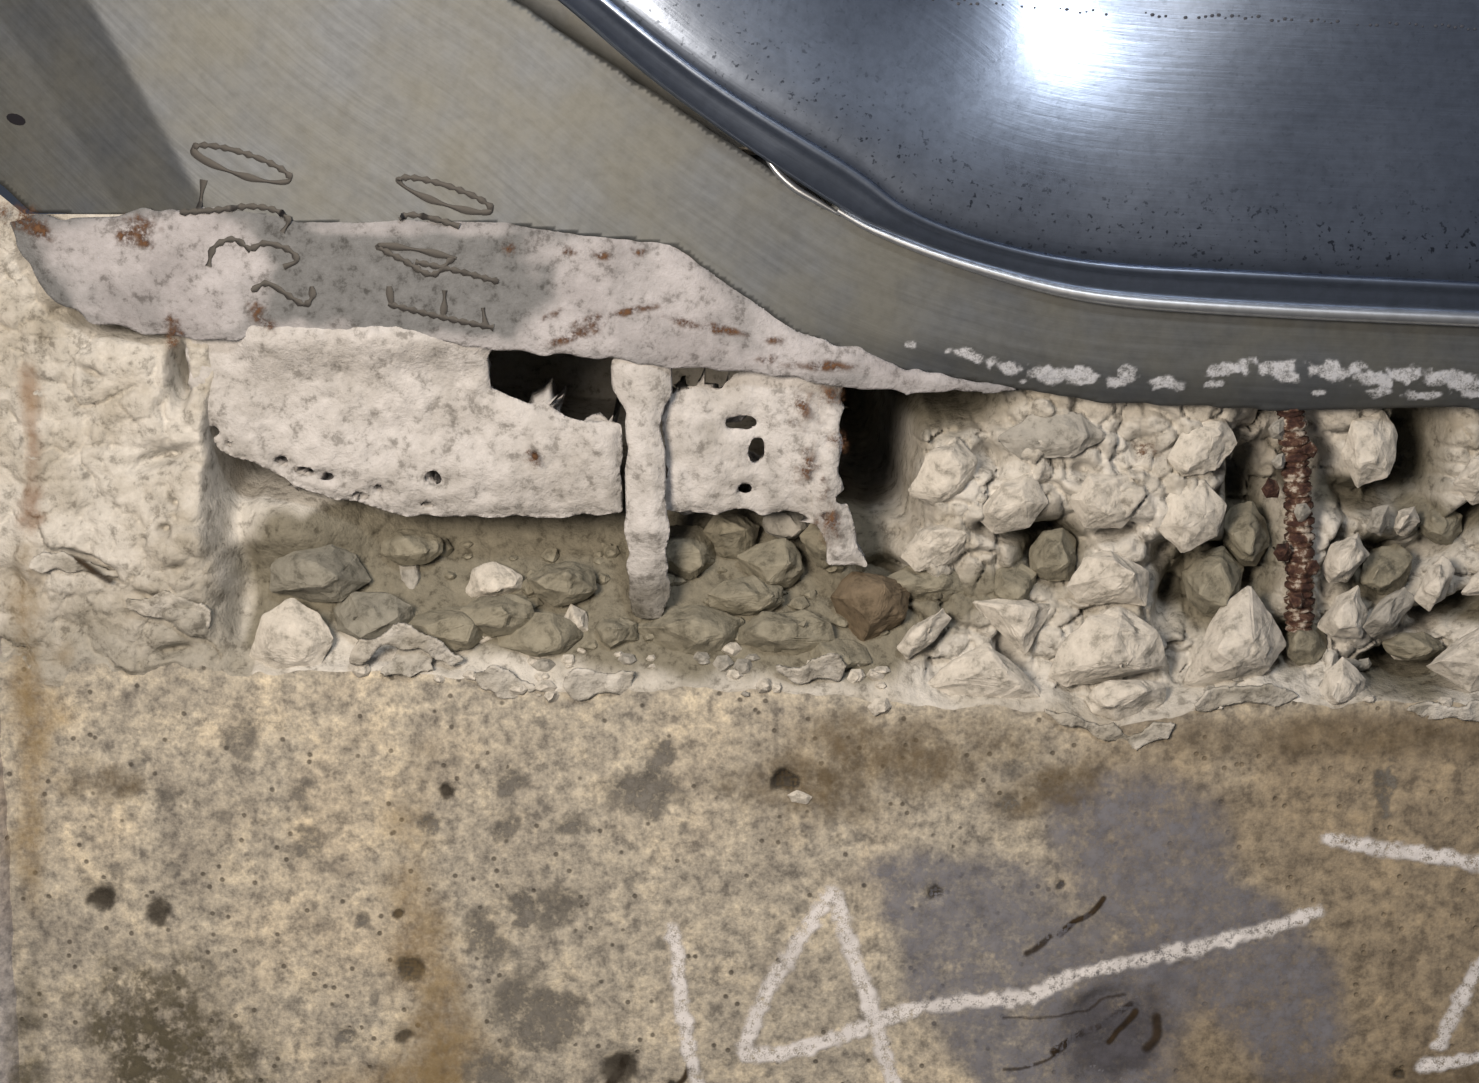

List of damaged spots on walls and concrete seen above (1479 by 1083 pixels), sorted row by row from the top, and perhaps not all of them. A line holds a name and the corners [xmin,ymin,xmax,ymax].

spalling [0,195,1479,751]
rust [1261,409,1320,633]
water stain [782,724,953,806]